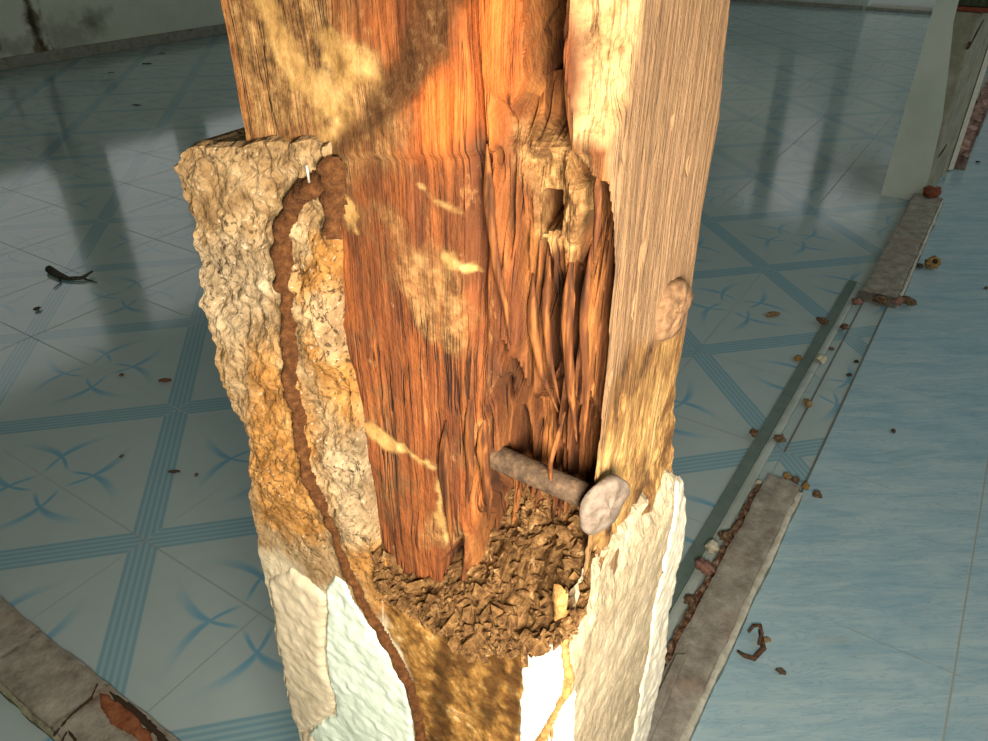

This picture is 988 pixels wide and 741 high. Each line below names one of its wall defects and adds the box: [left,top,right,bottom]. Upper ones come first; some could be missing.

peeling [269,567,414,741]
peeling [520,643,576,741]
peeling [631,474,686,741]